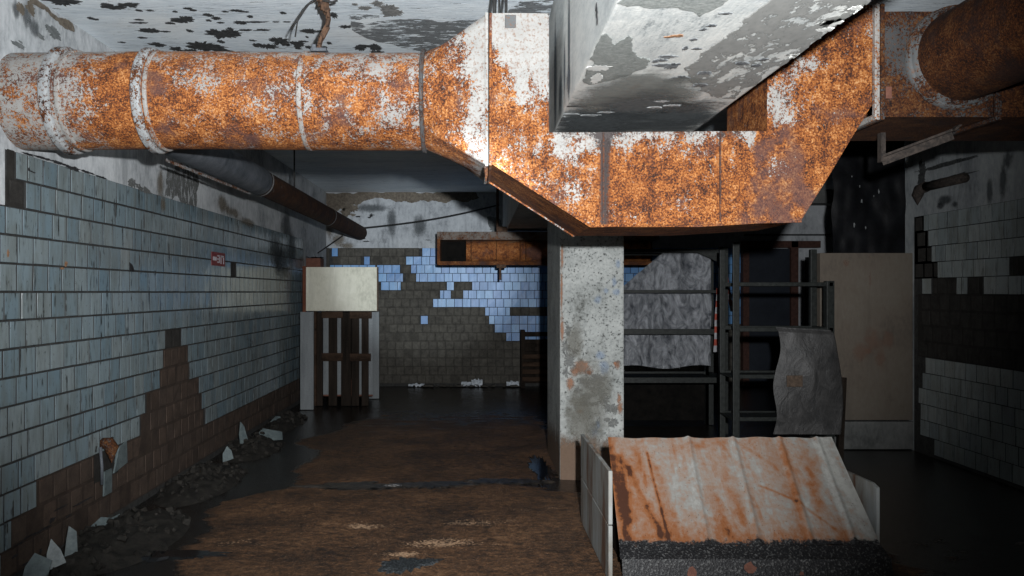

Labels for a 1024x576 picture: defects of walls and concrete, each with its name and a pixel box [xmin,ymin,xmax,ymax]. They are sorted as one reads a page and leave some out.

peeling [16,0,83,41]
peeling [87,2,332,51]
peeling [330,0,478,53]
spalling [582,0,871,99]
peeling [327,248,520,383]
peeling [510,307,545,316]
peeling [915,216,1024,371]
peeling [624,324,732,383]
peeling [0,328,300,576]